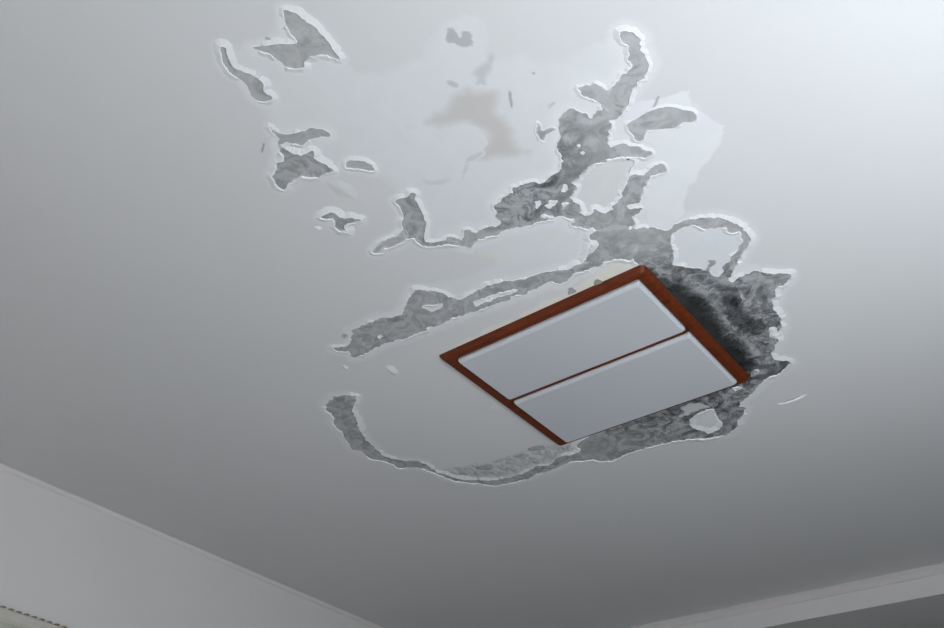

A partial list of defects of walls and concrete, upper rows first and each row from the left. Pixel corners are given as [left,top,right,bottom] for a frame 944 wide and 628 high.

peeling [204,0,389,199]
damp [403,10,537,187]
peeling [307,11,807,491]
damp [657,278,753,382]